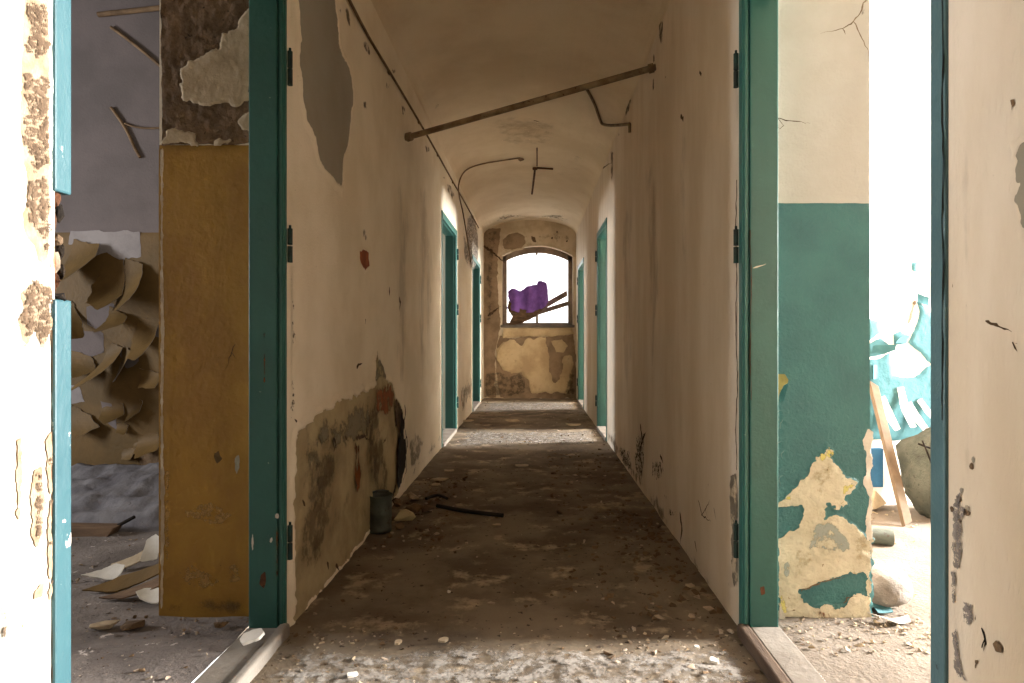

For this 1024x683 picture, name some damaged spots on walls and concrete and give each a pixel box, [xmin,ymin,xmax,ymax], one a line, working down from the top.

peeling [294,0,355,198]
crack [820,0,870,62]
flaking render [13,0,249,608]
flaking render [358,246,370,274]
flaking render [484,228,576,399]
flaking render [778,294,931,618]
peeling [950,488,973,681]